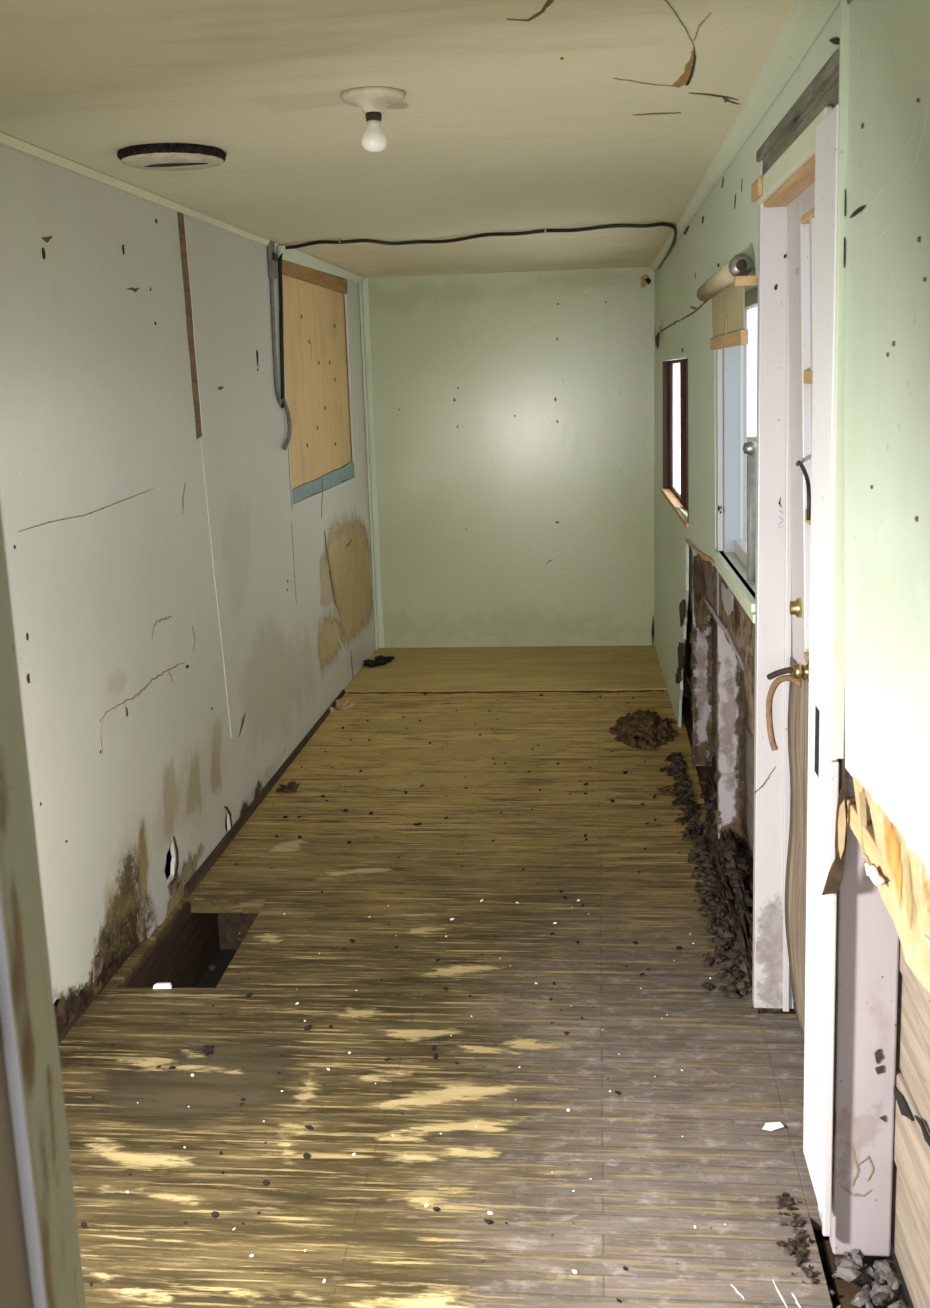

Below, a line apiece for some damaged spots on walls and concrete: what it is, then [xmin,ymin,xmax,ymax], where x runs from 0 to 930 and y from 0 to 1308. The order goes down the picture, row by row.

crack [506,0,554,22]
crack [632,92,740,116]
crack [19,441,246,753]
peeling [319,520,373,671]
peeling [675,599,685,684]
leakage [241,768,270,815]
peeling [865,863,885,885]
leakage [56,826,203,1023]
peeling [875,1049,884,1074]
peeling [832,1043,874,1196]